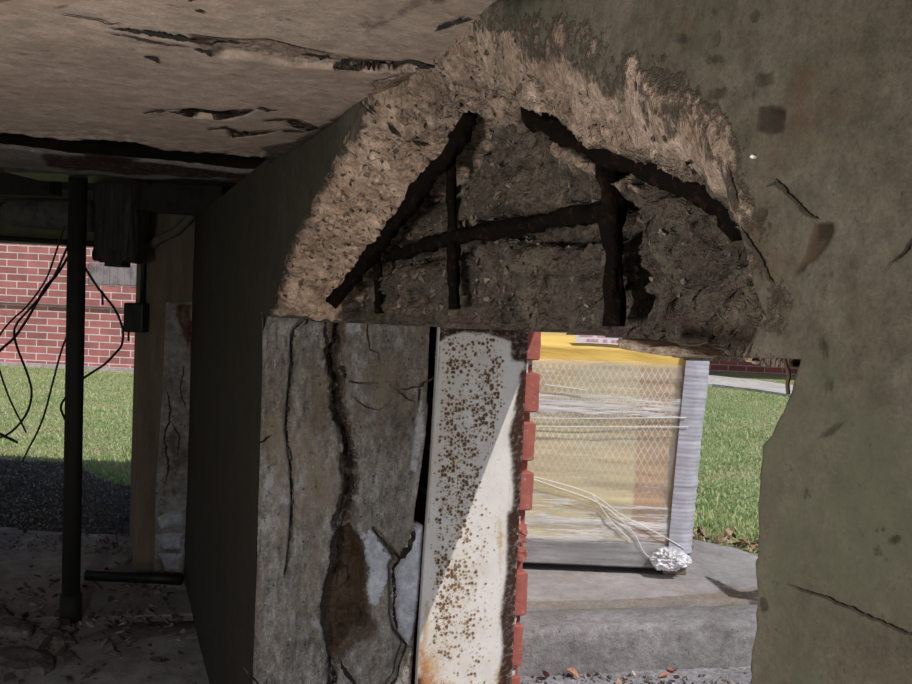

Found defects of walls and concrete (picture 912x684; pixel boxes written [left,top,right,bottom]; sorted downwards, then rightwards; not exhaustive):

crack [59,0,435,75]
spalling [269,14,801,368]
crack [258,319,434,571]
rust [418,327,528,684]
crack [330,660,357,684]
spalling [319,522,390,666]
crack [375,530,416,684]